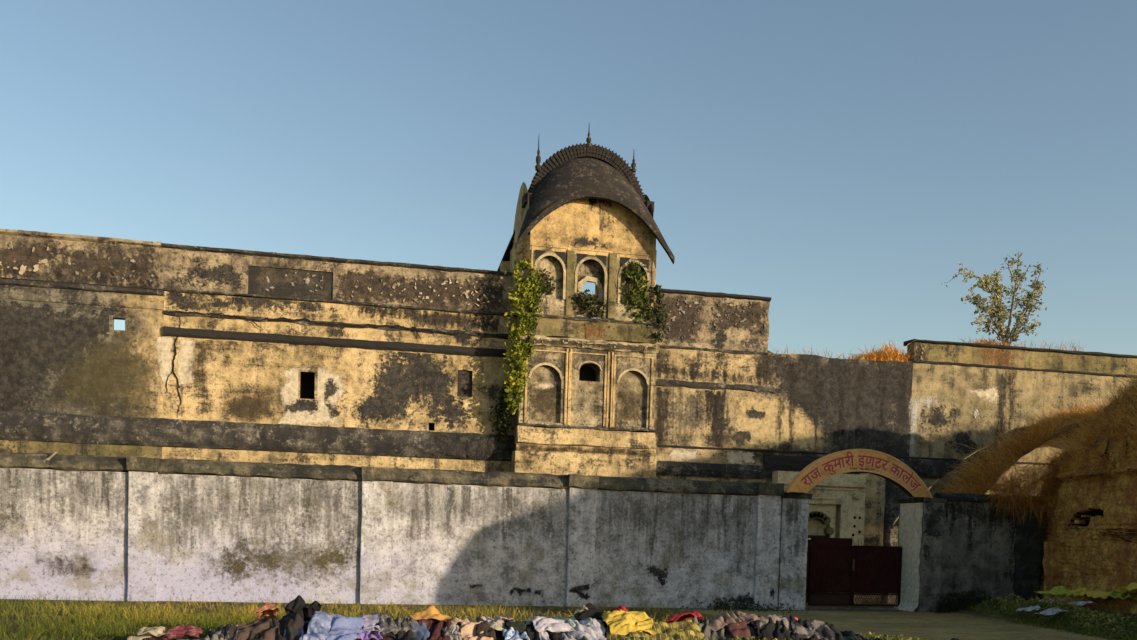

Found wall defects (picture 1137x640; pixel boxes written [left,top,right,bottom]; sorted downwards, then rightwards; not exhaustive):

leakage [0,300,136,411]
leakage [0,256,349,391]
leakage [222,393,273,422]
crack [156,311,491,418]
leakage [350,352,504,459]
leakage [359,306,500,346]
leakage [520,327,977,478]
leakage [984,371,1017,438]
leakage [647,565,668,585]
leakage [706,593,753,609]